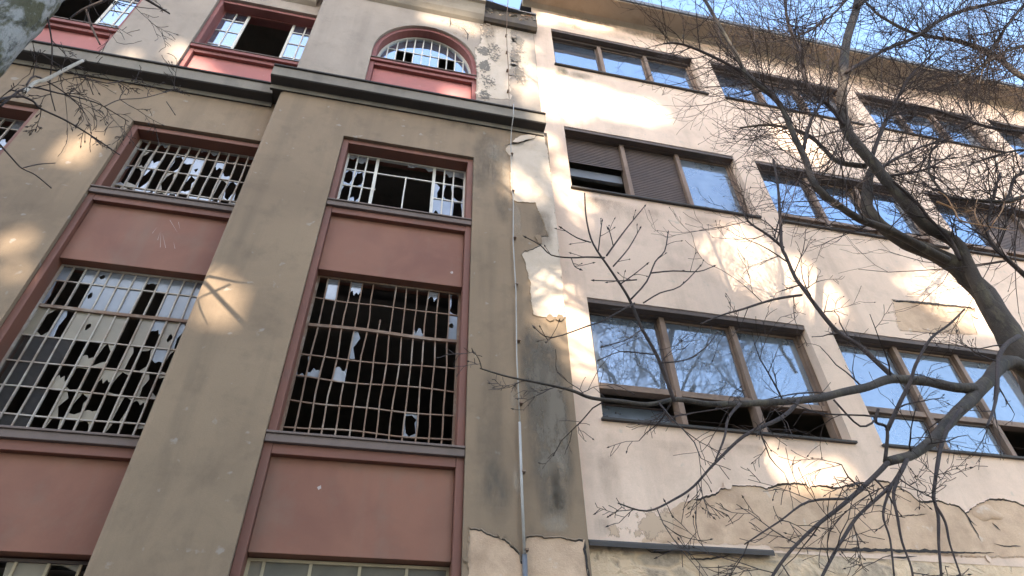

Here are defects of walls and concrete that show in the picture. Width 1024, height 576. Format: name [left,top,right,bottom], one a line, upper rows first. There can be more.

peeling [441,19,529,100]
flaking render [504,134,566,321]
flaking render [891,299,979,335]
water stain [524,330,571,514]
flaking render [462,526,588,576]
flaking render [609,479,1024,563]